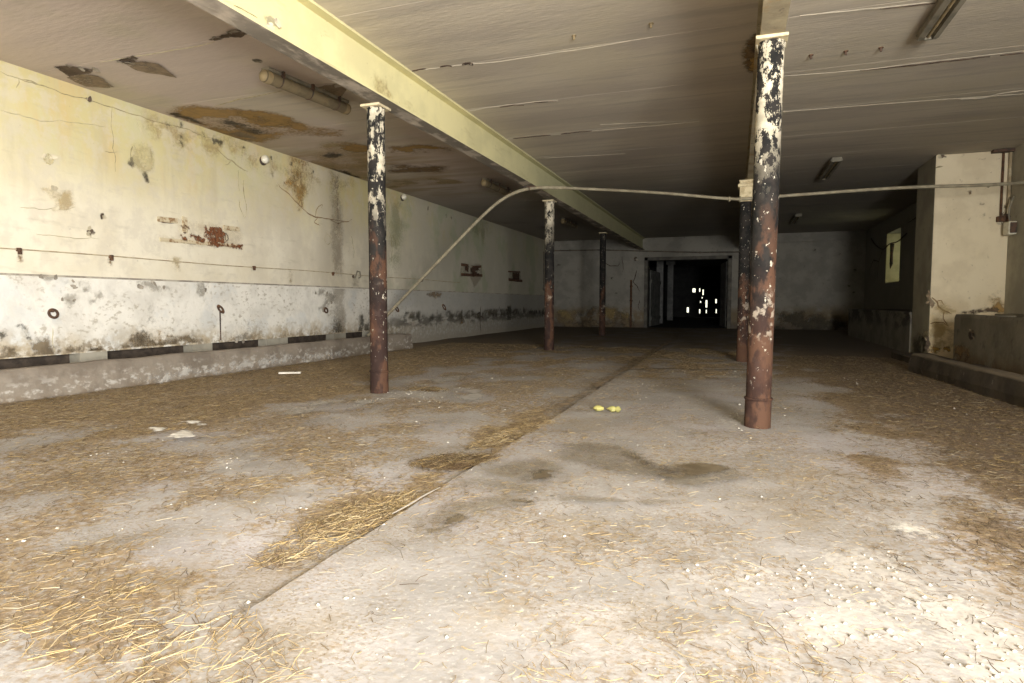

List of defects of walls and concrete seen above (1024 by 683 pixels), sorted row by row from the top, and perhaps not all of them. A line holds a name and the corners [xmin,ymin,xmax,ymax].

spalling [210,29,247,41]
spalling [54,64,113,102]
spalling [114,56,176,78]
leakage [170,105,367,158]
rust [157,216,243,249]
leakage [446,307,544,324]